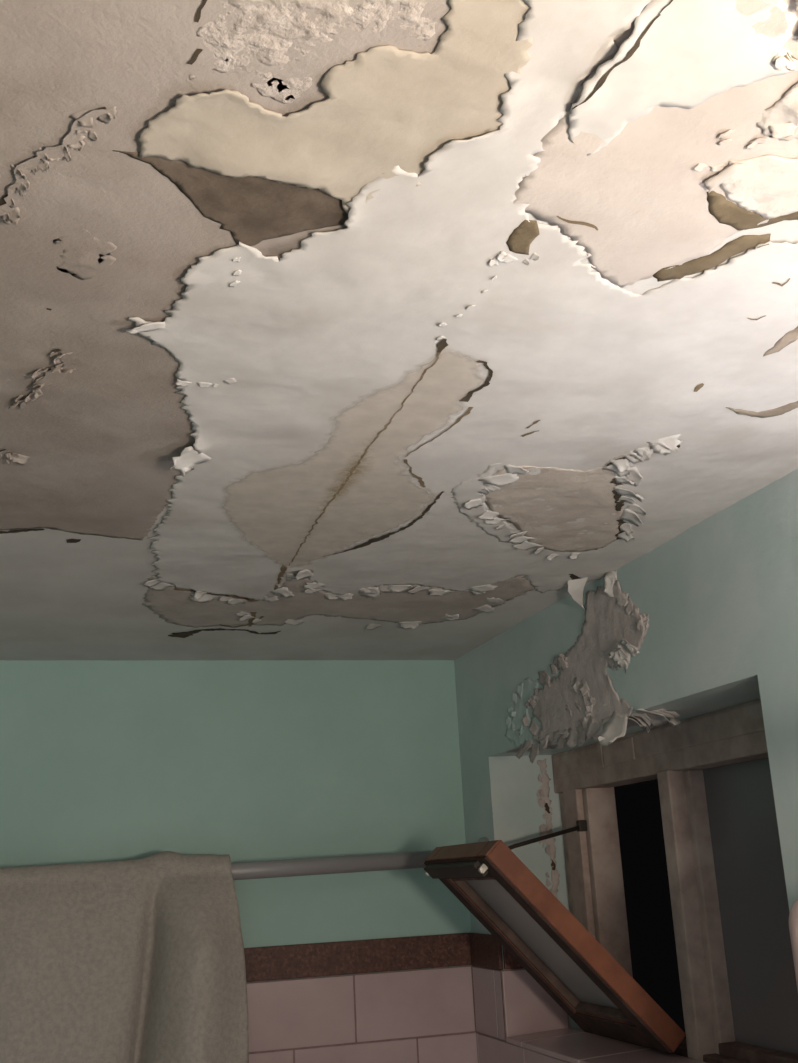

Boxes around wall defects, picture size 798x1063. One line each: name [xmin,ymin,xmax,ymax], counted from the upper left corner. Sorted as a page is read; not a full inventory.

crack [168,339,493,638]
peeling [0,0,798,763]